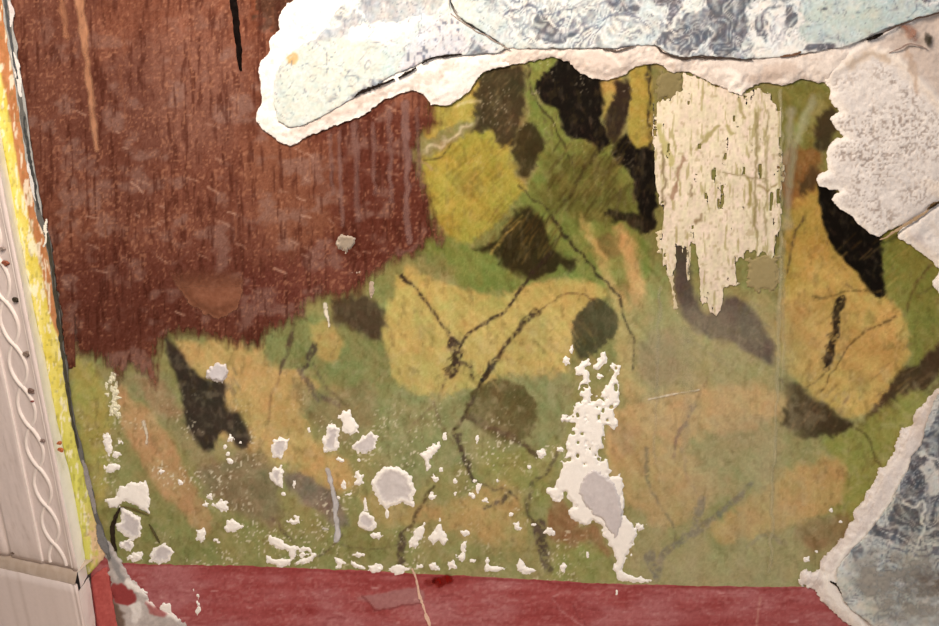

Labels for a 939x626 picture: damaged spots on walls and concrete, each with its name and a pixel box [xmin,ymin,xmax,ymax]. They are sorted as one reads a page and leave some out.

crack [230,0,242,71]
peeling [256,0,939,316]
spalling [105,480,187,626]
peeling [195,493,244,543]
peeling [269,436,296,496]
peeling [266,535,316,568]
peeling [322,409,416,540]
peeling [409,518,448,549]
peeling [419,432,447,500]
peeling [334,530,536,575]
peeling [527,345,652,595]
spalling [798,388,939,626]